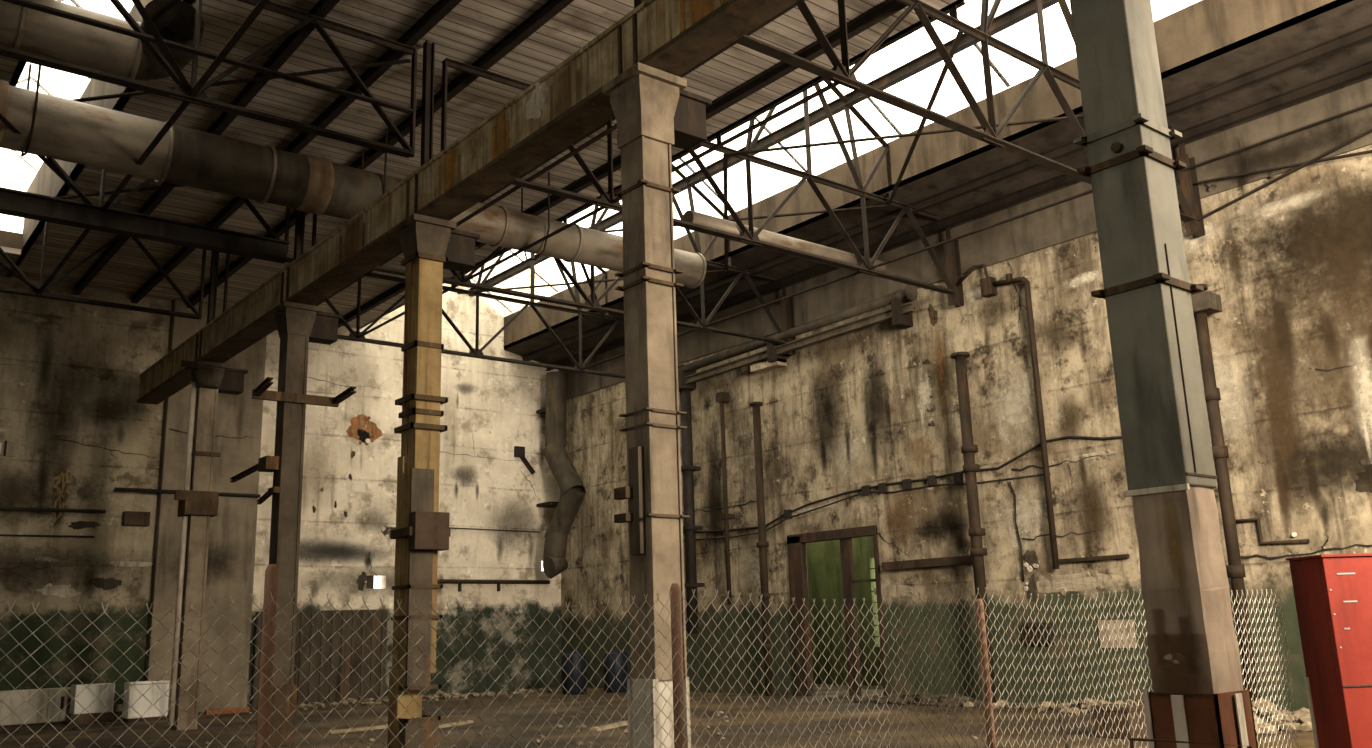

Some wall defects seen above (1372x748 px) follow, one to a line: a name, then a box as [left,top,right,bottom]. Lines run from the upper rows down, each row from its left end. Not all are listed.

damp [1233,187,1372,527]
damp [816,387,849,469]
damp [866,361,891,468]